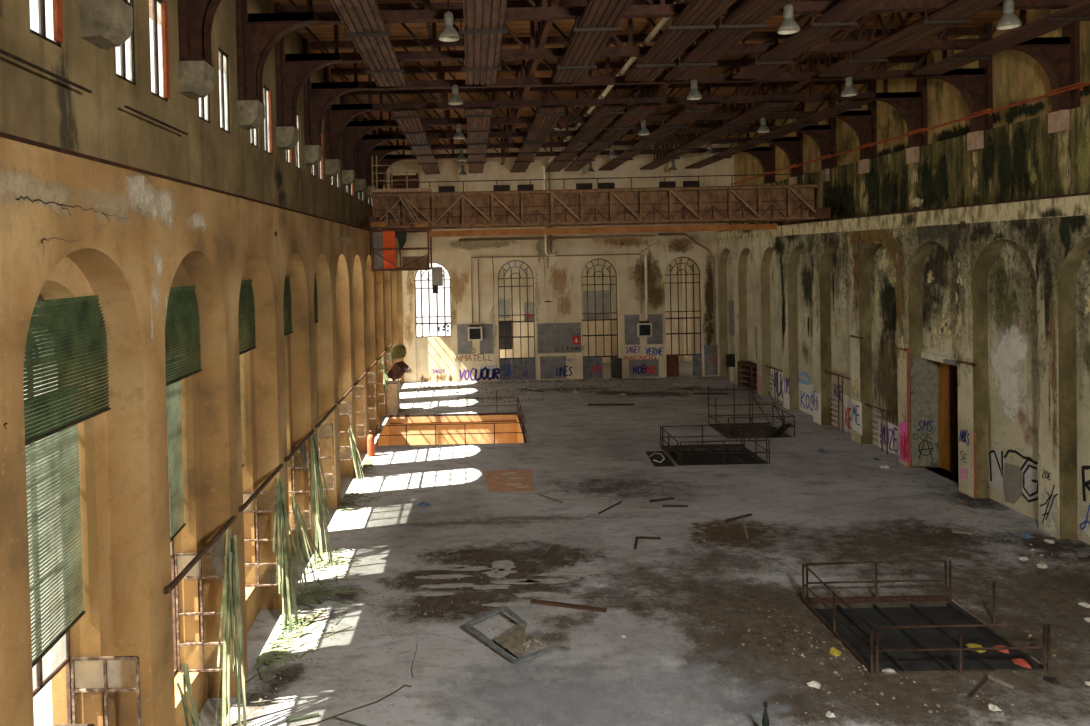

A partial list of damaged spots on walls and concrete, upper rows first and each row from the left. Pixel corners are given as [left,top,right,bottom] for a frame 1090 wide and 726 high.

water stain [972,152,988,191]
water stain [1059,130,1090,195]
water stain [605,238,665,308]
water stain [773,229,904,426]
water stain [894,170,1087,466]